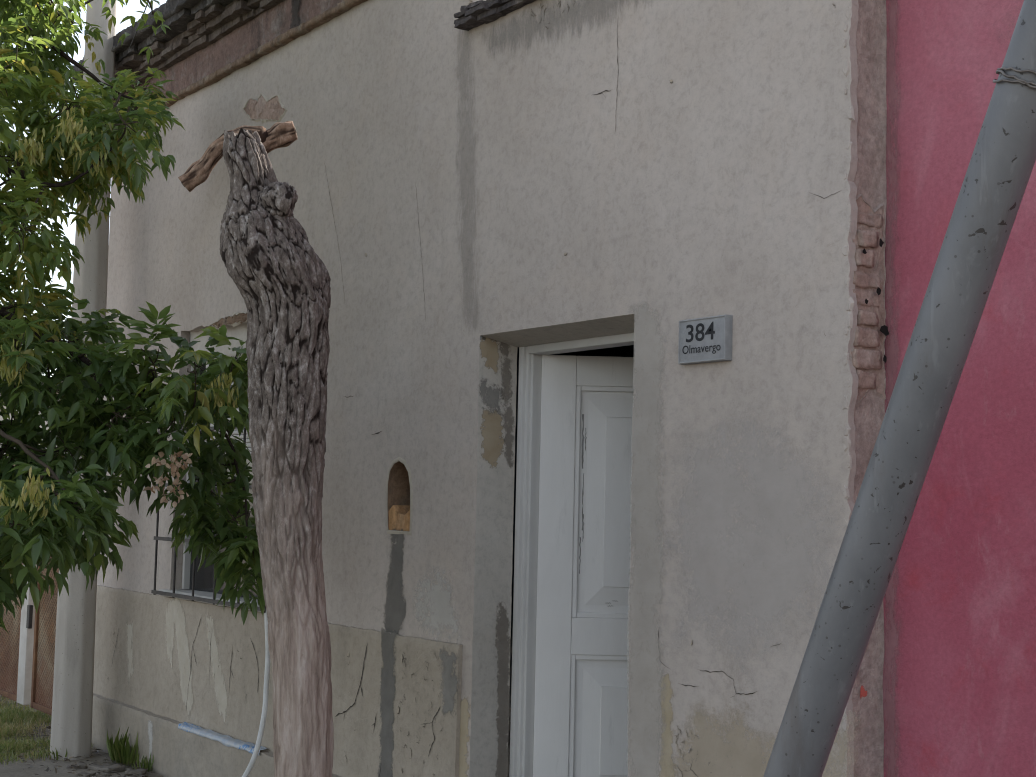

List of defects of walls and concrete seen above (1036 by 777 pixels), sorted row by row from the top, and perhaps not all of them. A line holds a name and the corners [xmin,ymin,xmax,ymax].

spalling [842,194,889,411]
peeling [480,337,499,374]
peeling [481,409,505,467]
crack [336,646,376,731]
crack [658,631,757,697]